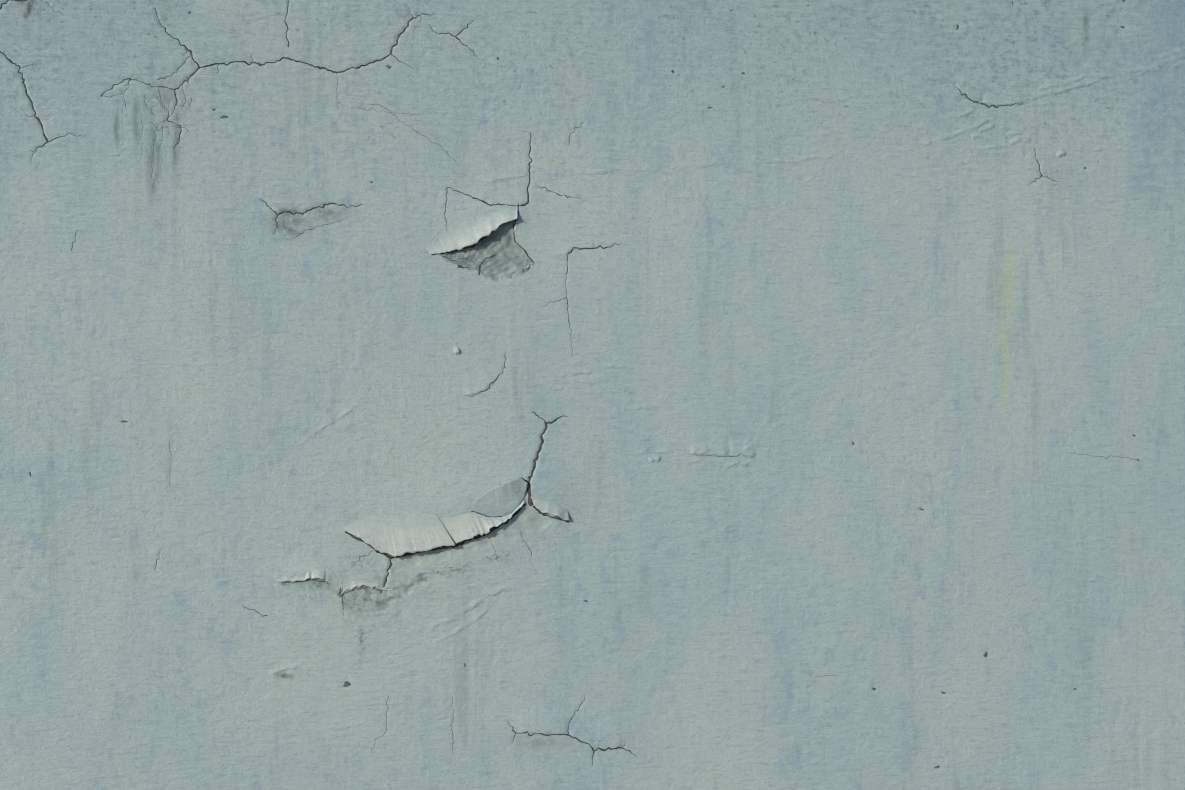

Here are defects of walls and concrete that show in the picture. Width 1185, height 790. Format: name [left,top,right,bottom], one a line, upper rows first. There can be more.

crack [0,51,80,162]
crack [100,1,477,176]
crack [954,86,1018,108]
peeling [425,133,540,288]
crack [543,243,622,357]
peeling [273,411,570,626]
crack [508,697,637,765]